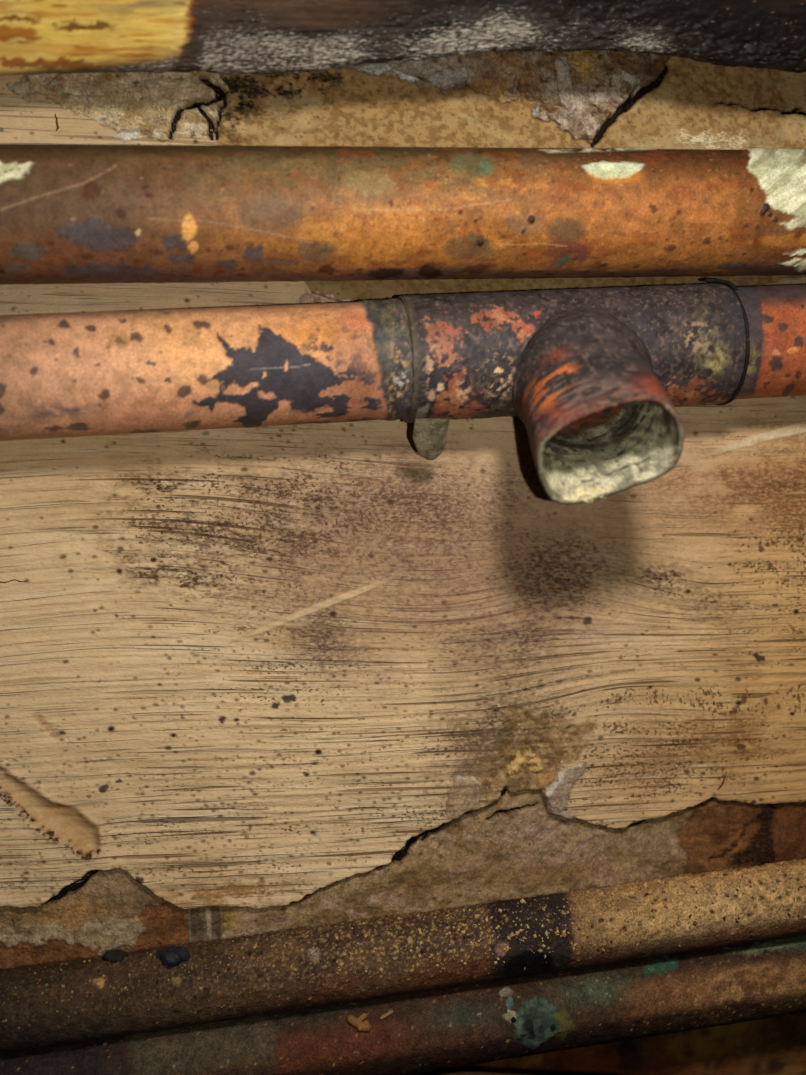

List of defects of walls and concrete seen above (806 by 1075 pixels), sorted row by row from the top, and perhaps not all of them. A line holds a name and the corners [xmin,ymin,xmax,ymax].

spalling [7,70,229,142]
crack [169,80,227,139]
spalling [349,50,671,142]
crack [590,67,668,146]
leakage [135,565,217,587]
spalling [0,777,101,860]
crack [374,787,537,869]
spalling [221,705,806,939]
crack [47,870,99,903]
spalling [0,868,190,969]